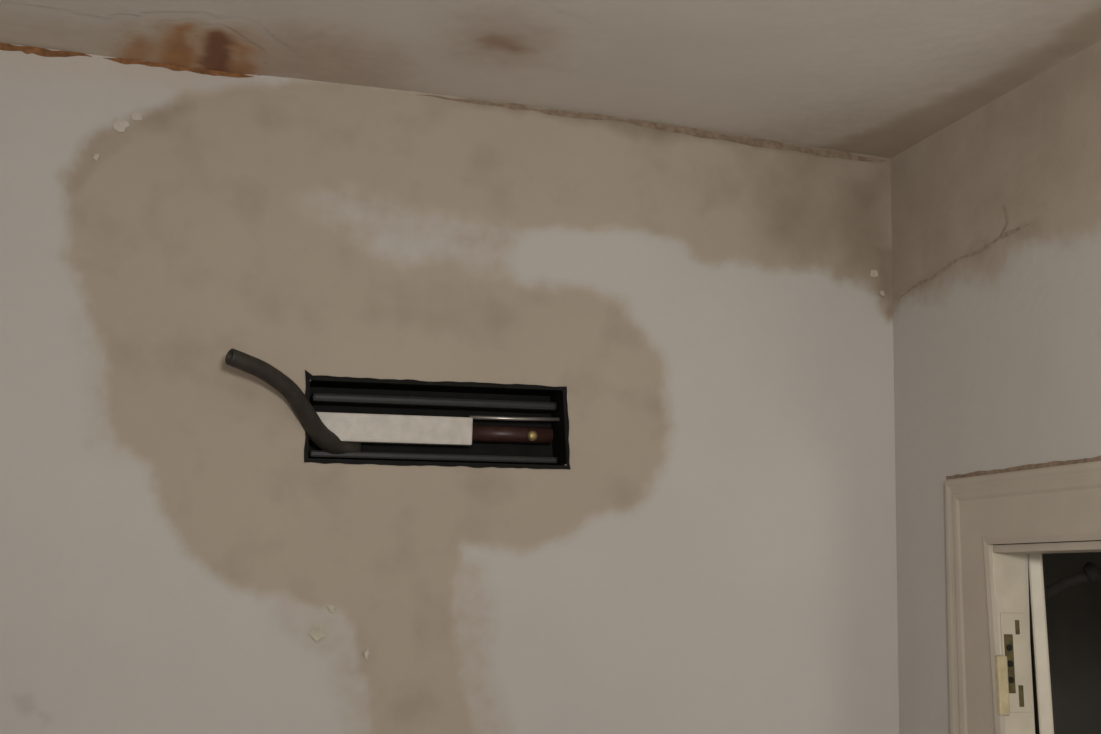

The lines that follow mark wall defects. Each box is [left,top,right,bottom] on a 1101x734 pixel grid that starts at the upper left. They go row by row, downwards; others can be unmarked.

corrosion [0,2,289,107]
damp [679,0,1101,158]
damp [891,40,1101,329]
damp [46,6,893,734]